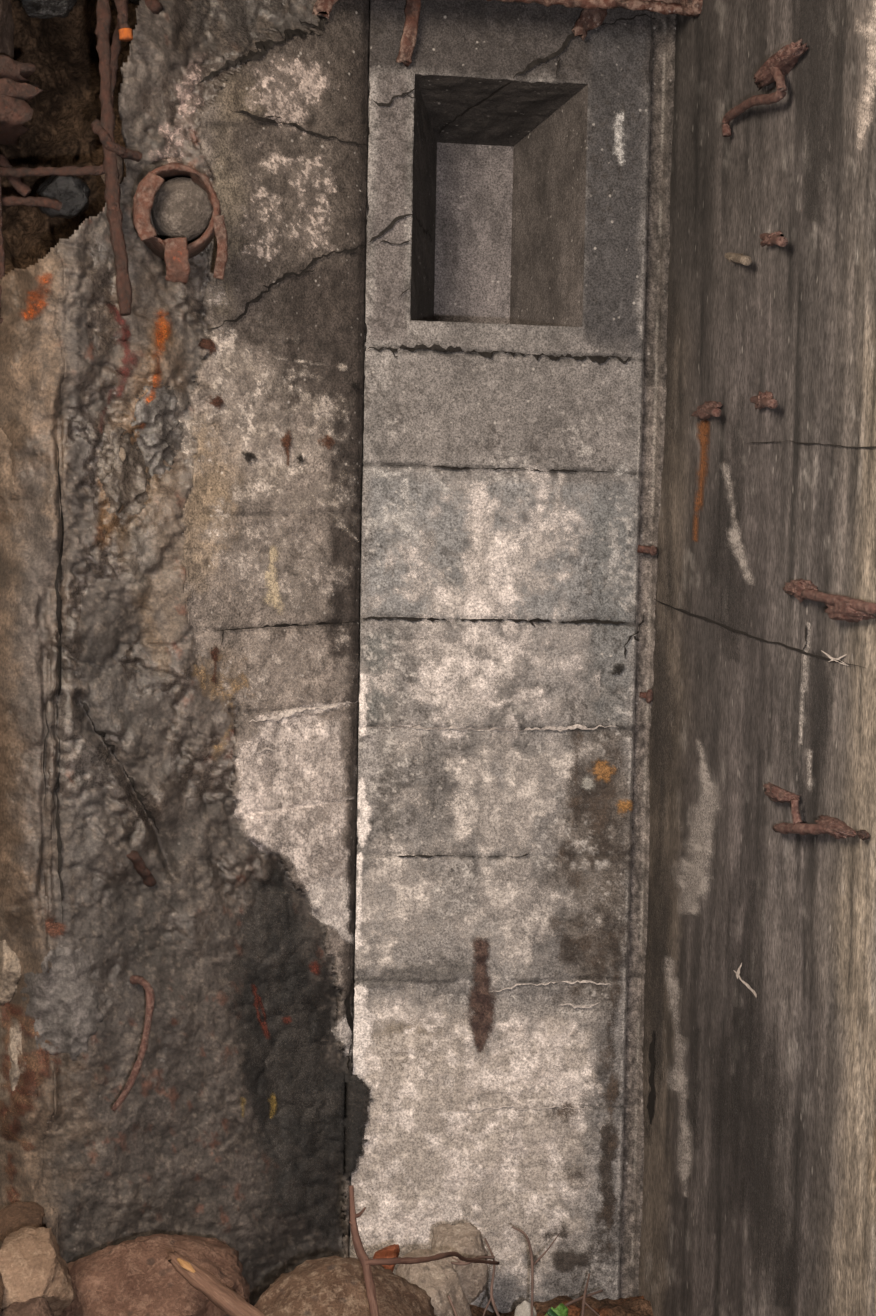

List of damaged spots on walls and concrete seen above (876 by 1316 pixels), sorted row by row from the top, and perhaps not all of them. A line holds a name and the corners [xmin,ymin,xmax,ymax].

crack [195,15,328,87]
crack [439,13,655,134]
corrosion [681,0,703,17]
corrosion [132,162,228,285]
corrosion [100,303,139,431]
crack [206,47,876,1070]
leakage [607,528,631,600]
leakage [708,432,753,661]
leakage [783,622,831,818]
leakage [225,467,627,1295]
corrosion [468,938,495,1052]
leakage [646,557,798,1307]